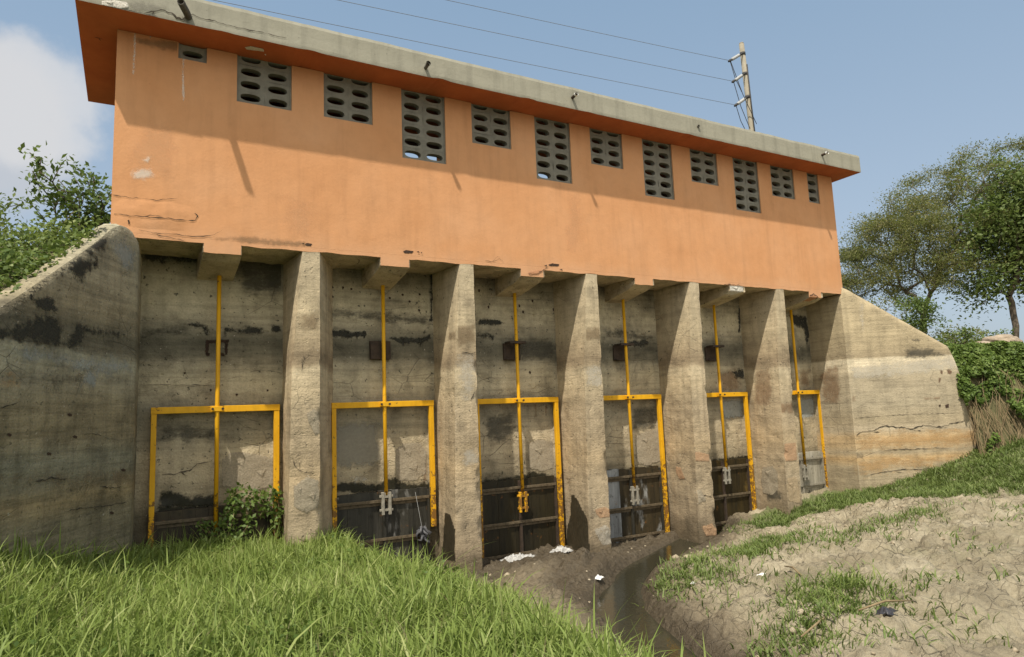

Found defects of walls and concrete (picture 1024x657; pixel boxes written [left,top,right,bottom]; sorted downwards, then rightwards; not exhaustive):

crack [116,195,218,241]
damp [0,238,125,349]
damp [332,329,366,339]
damp [347,274,433,346]
damp [907,339,939,357]
crack [856,412,970,475]